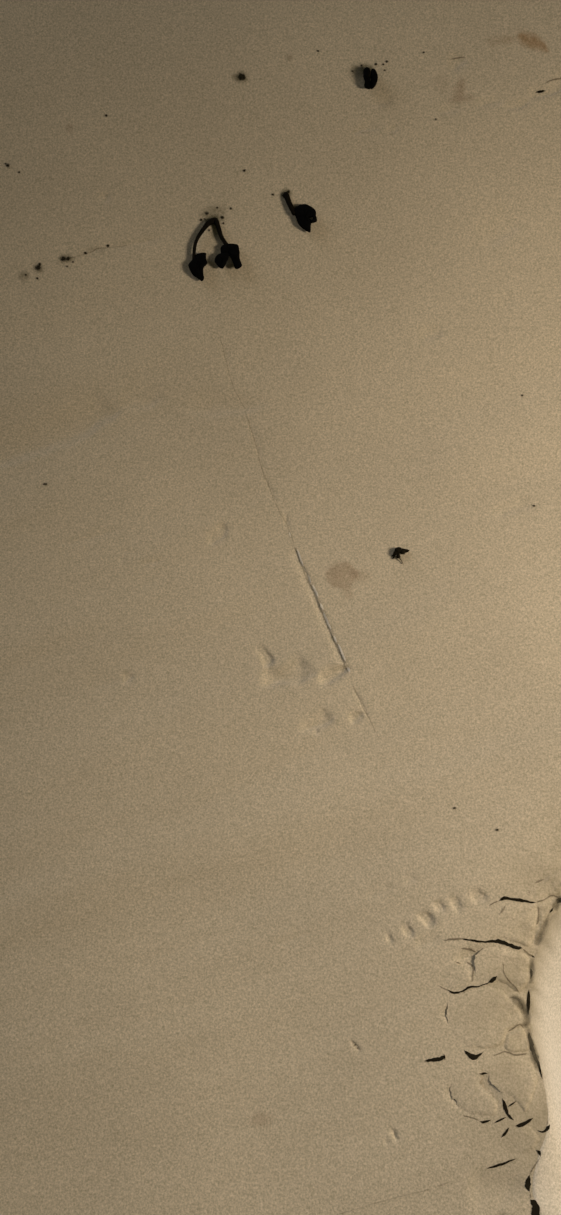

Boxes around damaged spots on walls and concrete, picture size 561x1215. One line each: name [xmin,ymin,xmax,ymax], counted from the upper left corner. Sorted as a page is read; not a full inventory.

crack [246,414,372,723]
crack [490,896,561,913]
crack [426,1050,488,1075]
crack [448,938,543,1079]
crack [480,1099,550,1215]